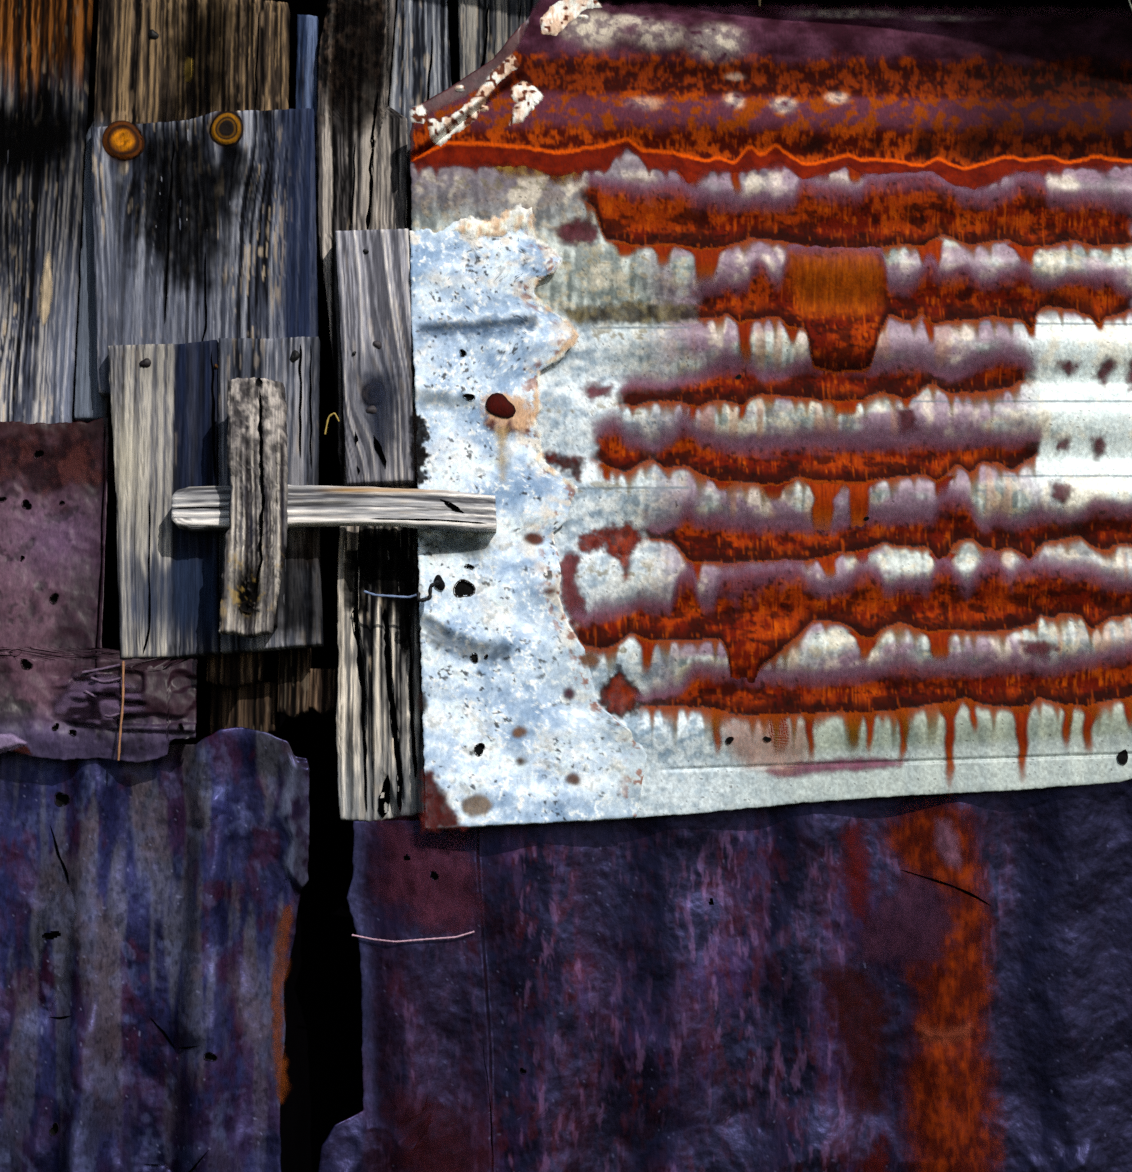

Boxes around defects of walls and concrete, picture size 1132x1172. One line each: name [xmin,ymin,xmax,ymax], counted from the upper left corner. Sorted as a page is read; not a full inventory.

peeling [411,55,542,146]
rust [410,0,1132,778]
rust [845,826,872,919]
rust [817,966,887,1114]
rust [889,803,993,1172]